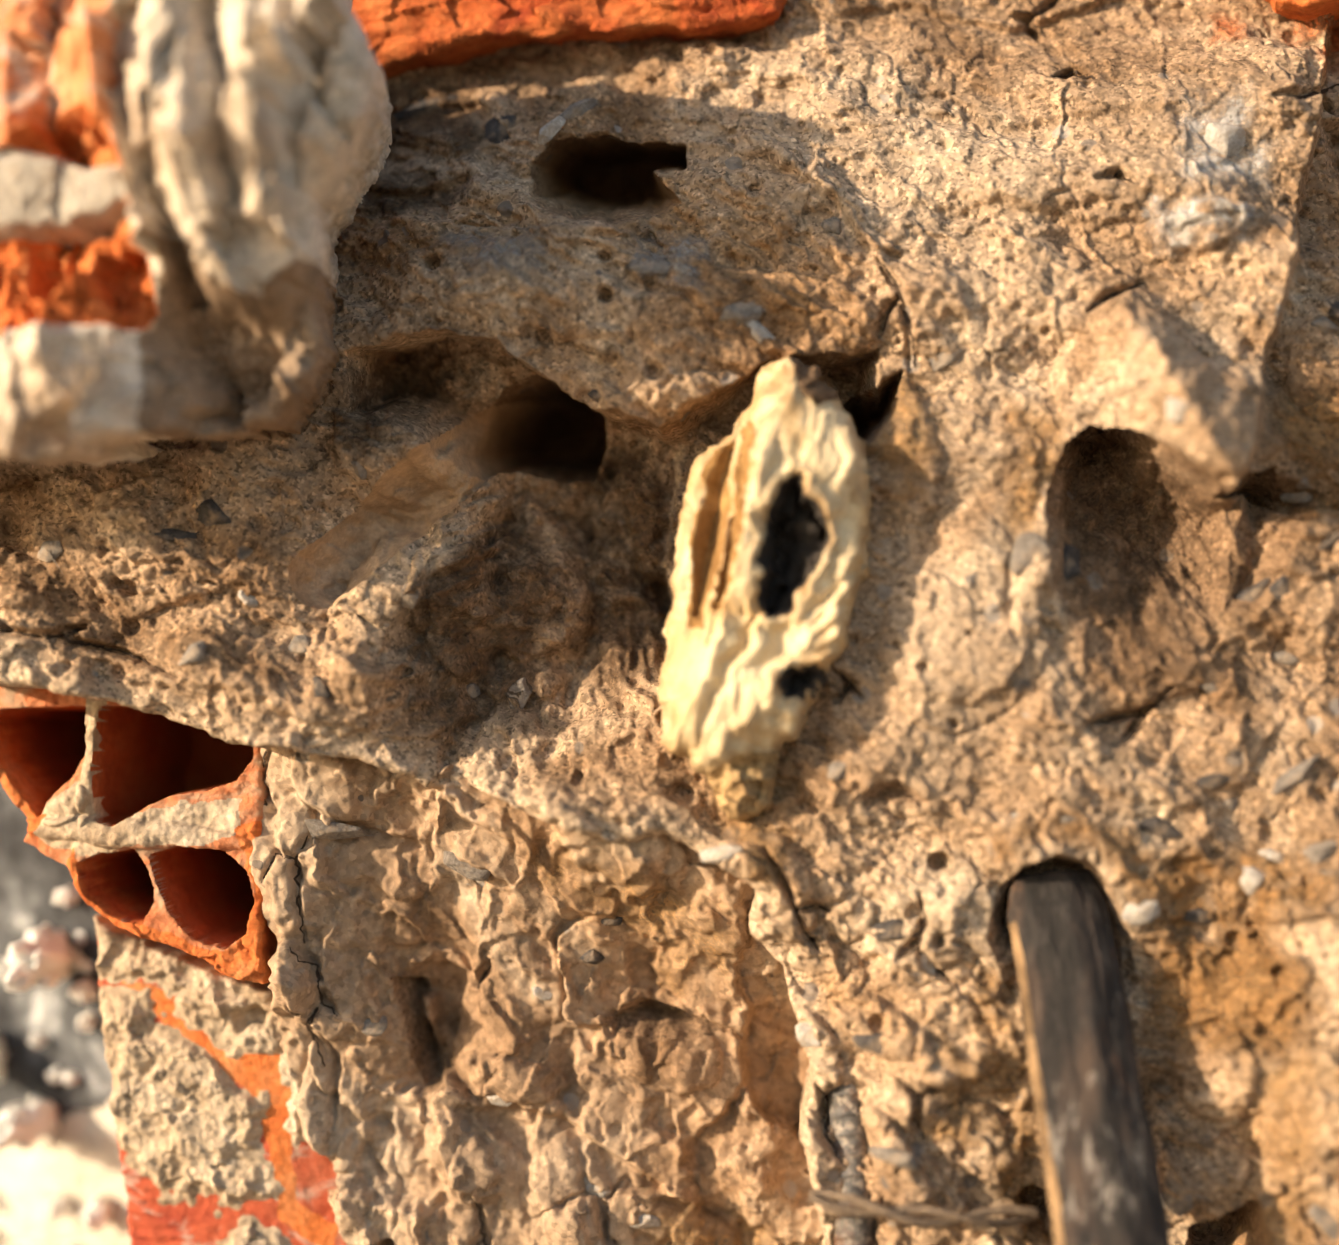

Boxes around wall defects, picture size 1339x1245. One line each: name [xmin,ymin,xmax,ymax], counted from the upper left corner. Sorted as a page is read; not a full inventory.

crack [1013,0,1058,37]
crack [0,628,177,678]
peeling [0,782,286,1219]
spalling [309,1145,338,1209]